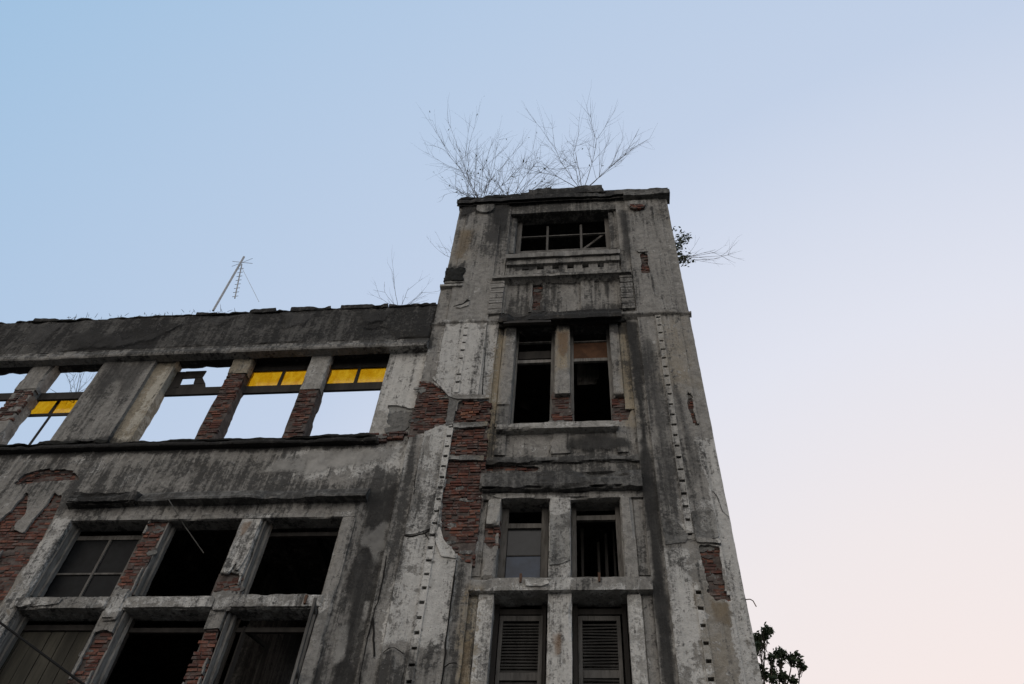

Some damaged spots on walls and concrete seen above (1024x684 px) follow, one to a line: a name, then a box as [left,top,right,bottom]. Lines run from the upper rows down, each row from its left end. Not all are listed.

flaking render [636,249,650,273]
flaking render [0,470,79,608]
leakage [333,484,396,684]
flaking render [367,377,538,568]
leakage [568,322,675,684]
flaking render [687,394,697,426]
flaking render [661,509,731,601]